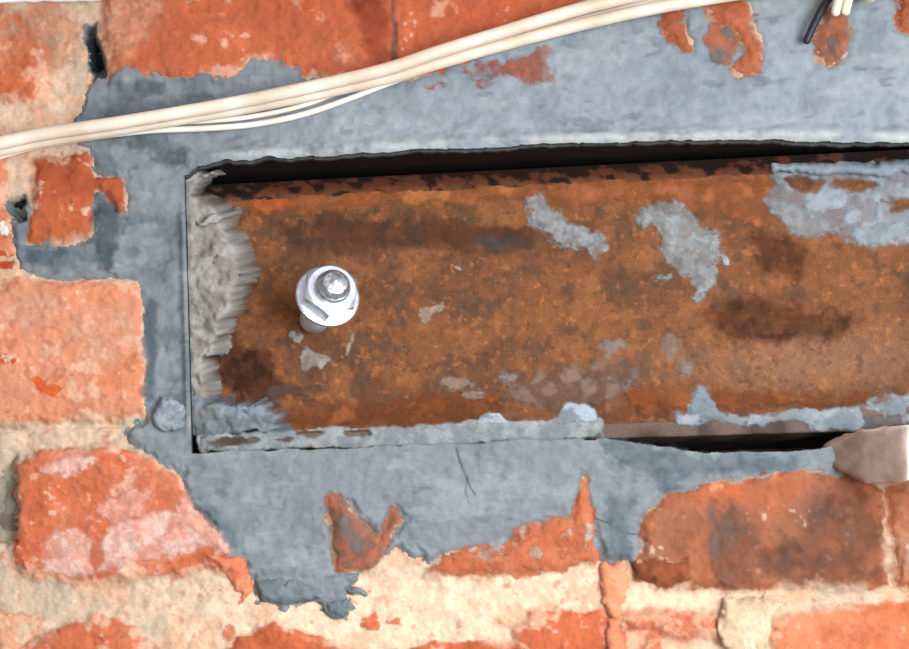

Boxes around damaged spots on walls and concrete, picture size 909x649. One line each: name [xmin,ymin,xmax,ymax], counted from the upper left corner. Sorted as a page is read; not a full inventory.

spalling [659,9,691,53]
spalling [704,1,761,76]
spalling [813,8,850,66]
spalling [898,0,909,31]
rust [230,174,771,253]
rust [717,301,850,340]
rust [211,345,300,401]
rust [288,392,498,432]
rust [625,385,693,416]
rust [711,390,863,413]
spalling [325,495,401,571]
spalling [430,475,600,579]